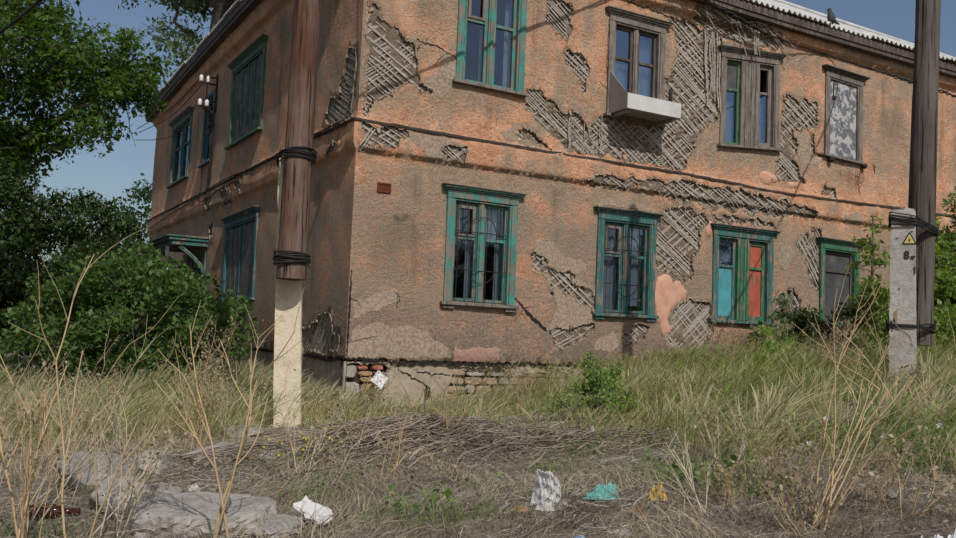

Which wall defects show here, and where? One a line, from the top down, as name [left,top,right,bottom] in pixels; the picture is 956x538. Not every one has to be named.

spalling [324,0,468,164]
spalling [502,0,825,353]
peeling [302,288,451,360]
crack [302,270,598,386]